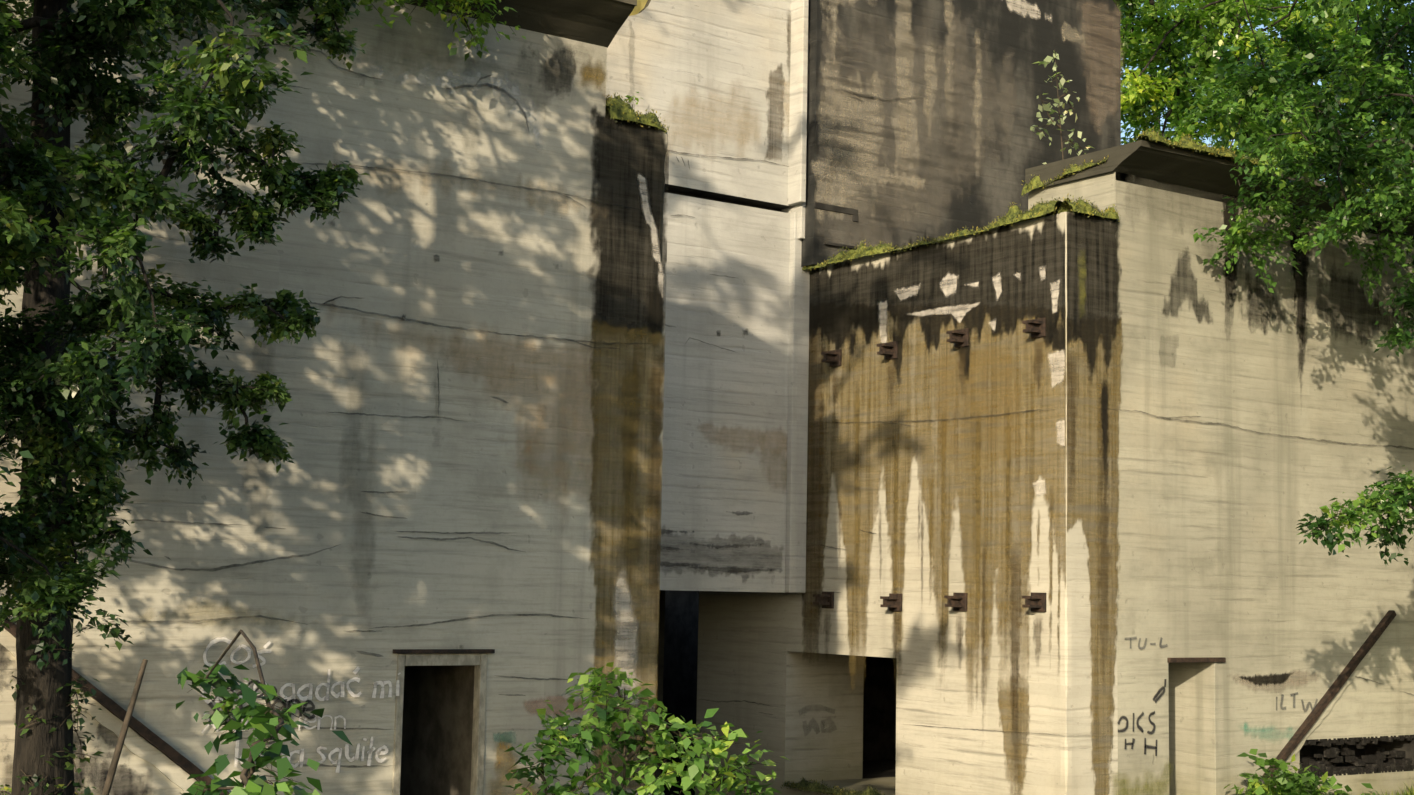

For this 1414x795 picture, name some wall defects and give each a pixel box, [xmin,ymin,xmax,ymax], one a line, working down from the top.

water stain [1008,0,1038,18]
crack [443,75,529,130]
water stain [582,66,605,85]
water stain [813,0,954,220]
water stain [974,37,988,125]
water stain [1163,253,1209,322]
water stain [1223,194,1239,311]
water stain [1289,208,1311,371]
water stain [590,108,669,791]
water stain [803,205,1123,795]